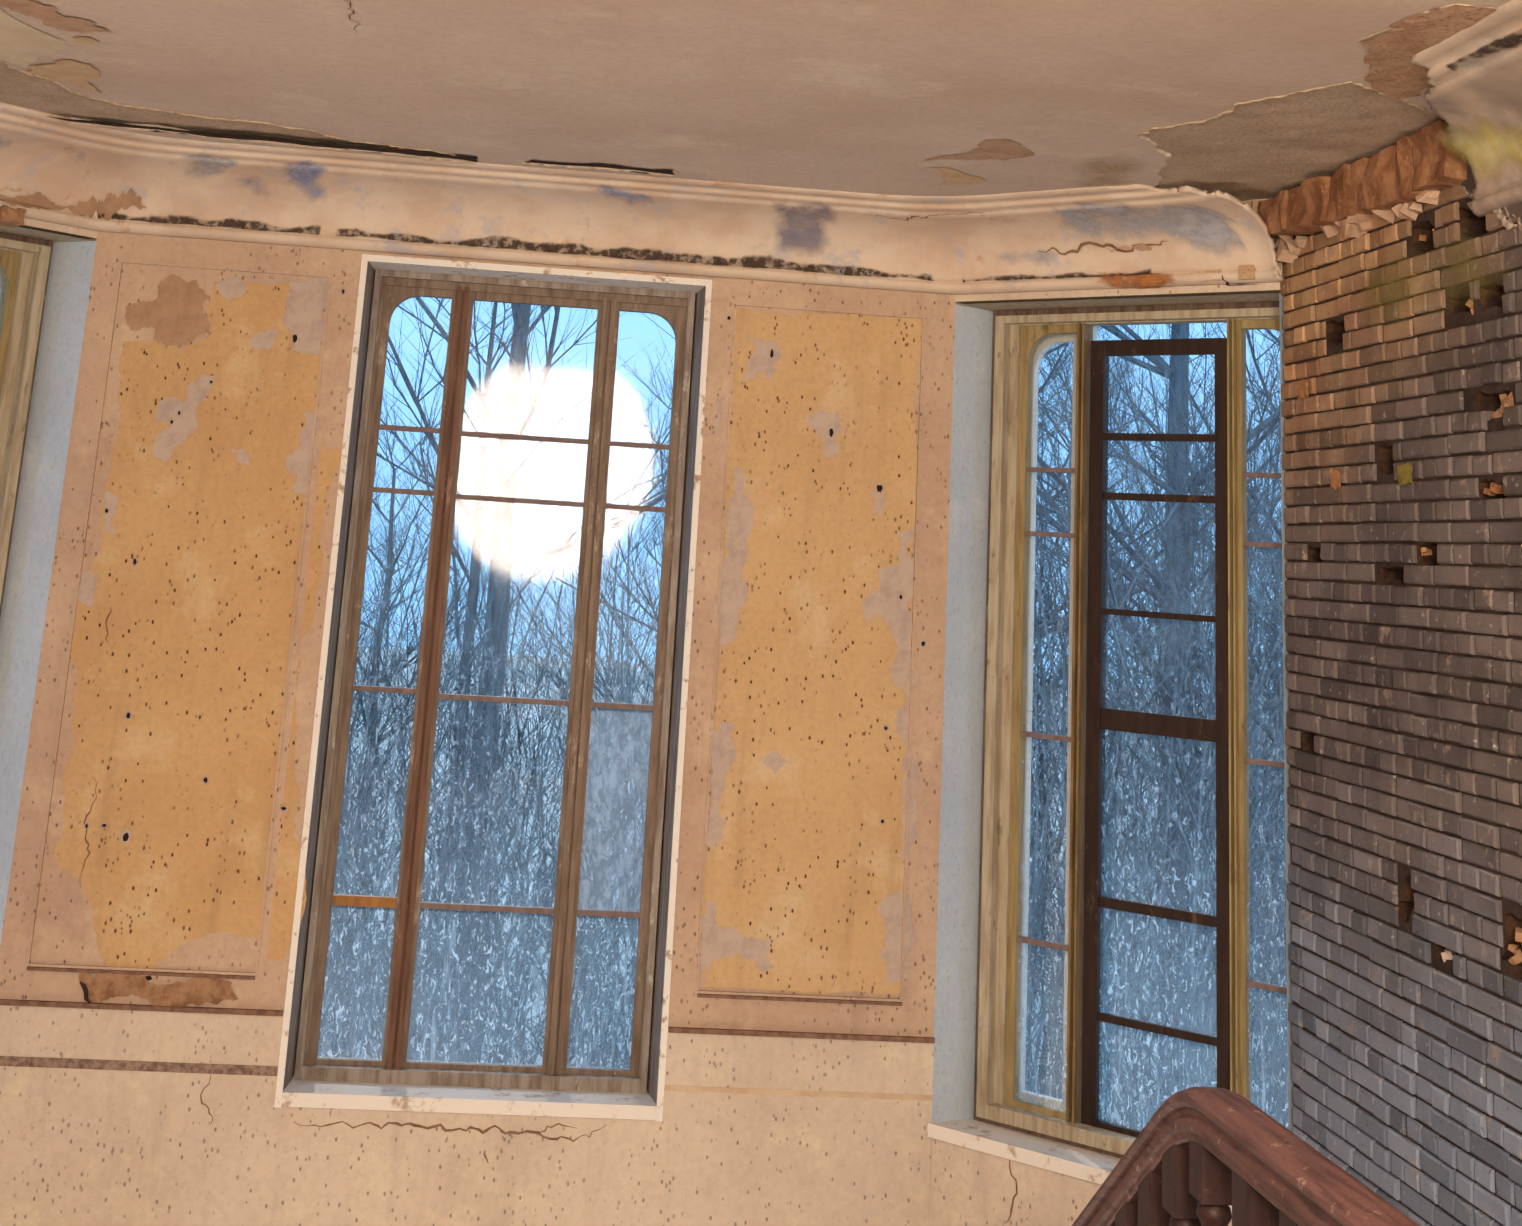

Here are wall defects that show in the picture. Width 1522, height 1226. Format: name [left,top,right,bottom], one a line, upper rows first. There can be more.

spalling [0,0,456,159]
spalling [1134,3,1498,212]
crack [47,116,478,164]
crack [523,160,679,177]
peeling [923,139,1035,187]
peeling [0,186,146,220]
crack [1038,241,1165,255]
peeling [125,274,249,349]
flaking render [1189,184,1522,1226]
spalling [79,972,239,1007]
crack [295,1121,606,1164]